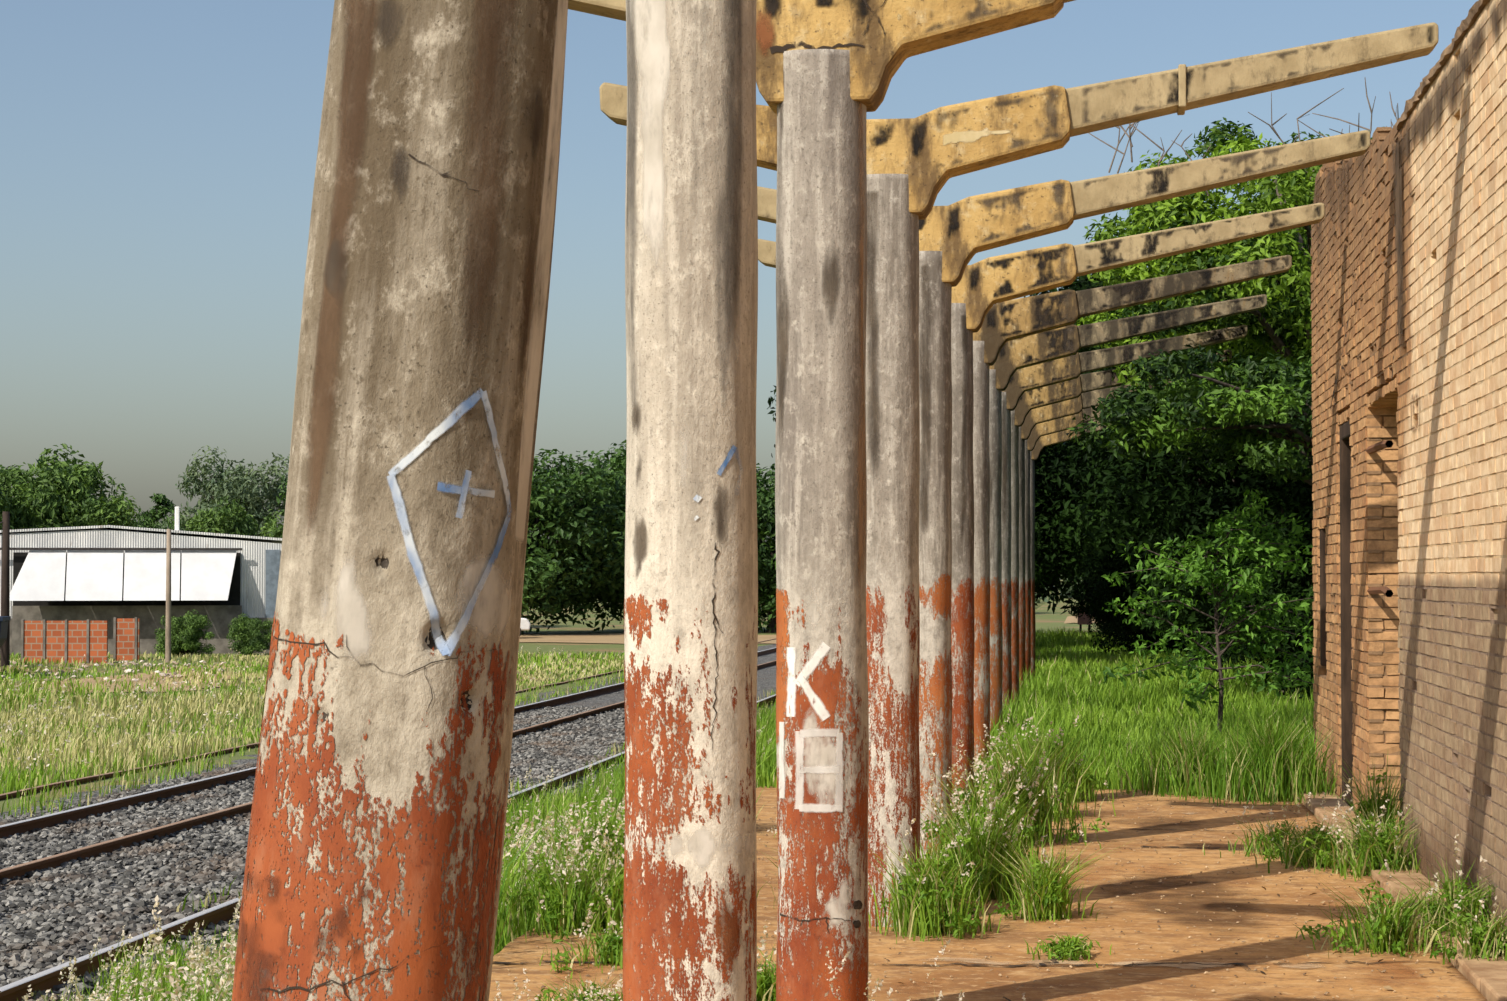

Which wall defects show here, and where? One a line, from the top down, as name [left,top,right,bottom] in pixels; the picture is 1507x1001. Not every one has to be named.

damp [309,0,400,518]
peeling [635,0,670,262]
damp [867,193,878,463]
damp [912,123,925,156]
damp [970,248,1263,497]
crack [274,636,372,666]
peeling [232,561,513,1001]
crack [406,649,497,712]
peeling [623,593,756,1001]
crack [711,544,723,751]
peeling [776,573,1036,1001]
crack [265,941,447,1001]